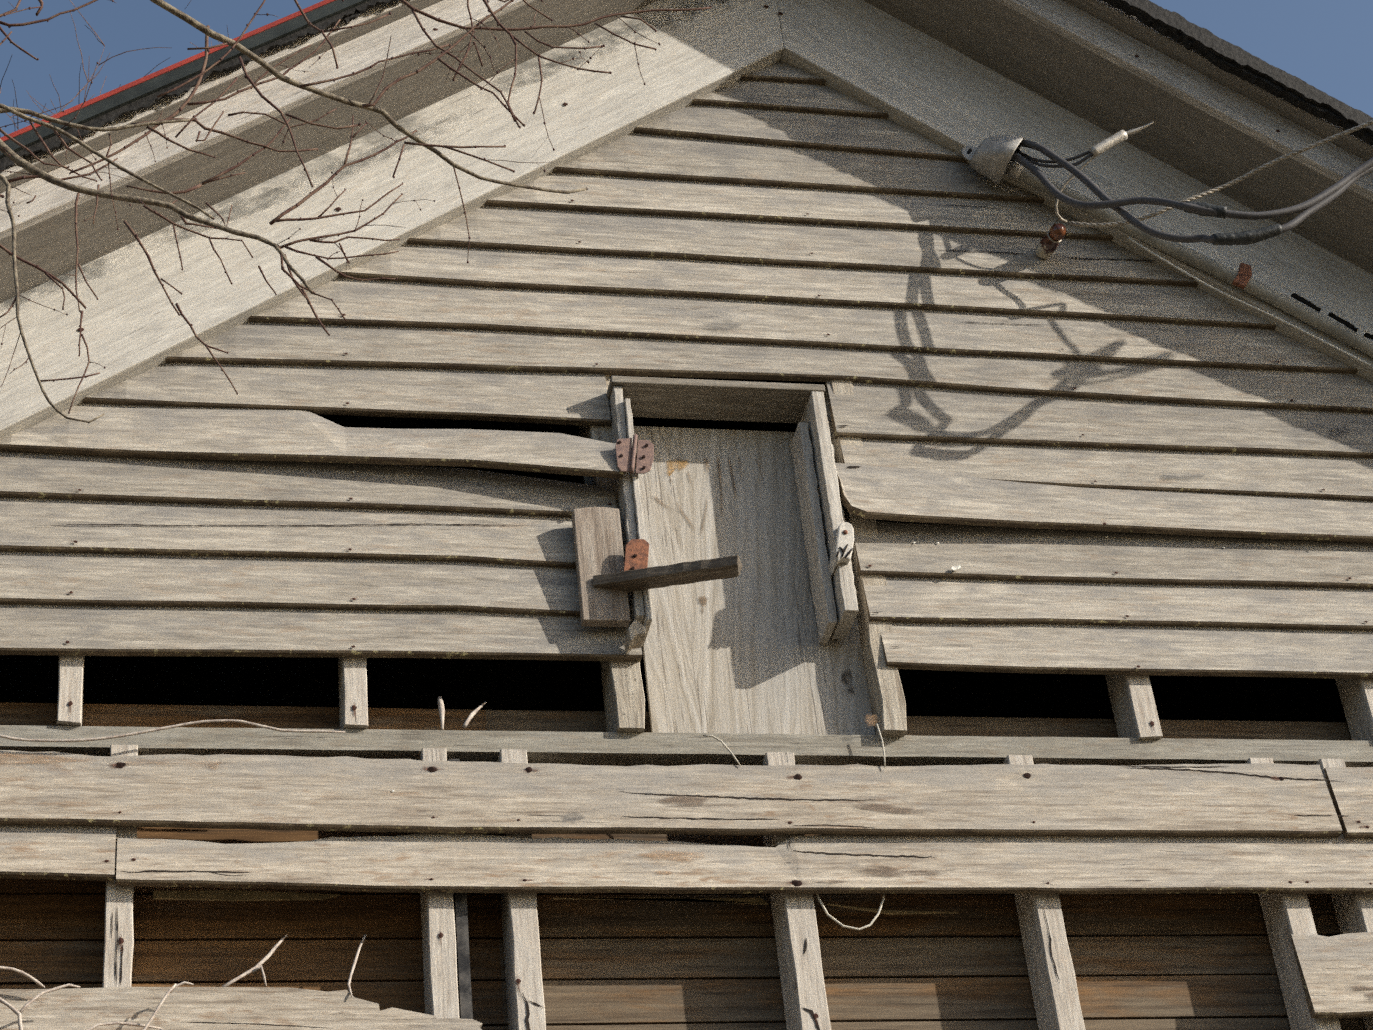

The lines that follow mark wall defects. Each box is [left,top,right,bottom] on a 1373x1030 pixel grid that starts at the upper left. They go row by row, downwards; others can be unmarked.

peeling [1291,291,1373,340]